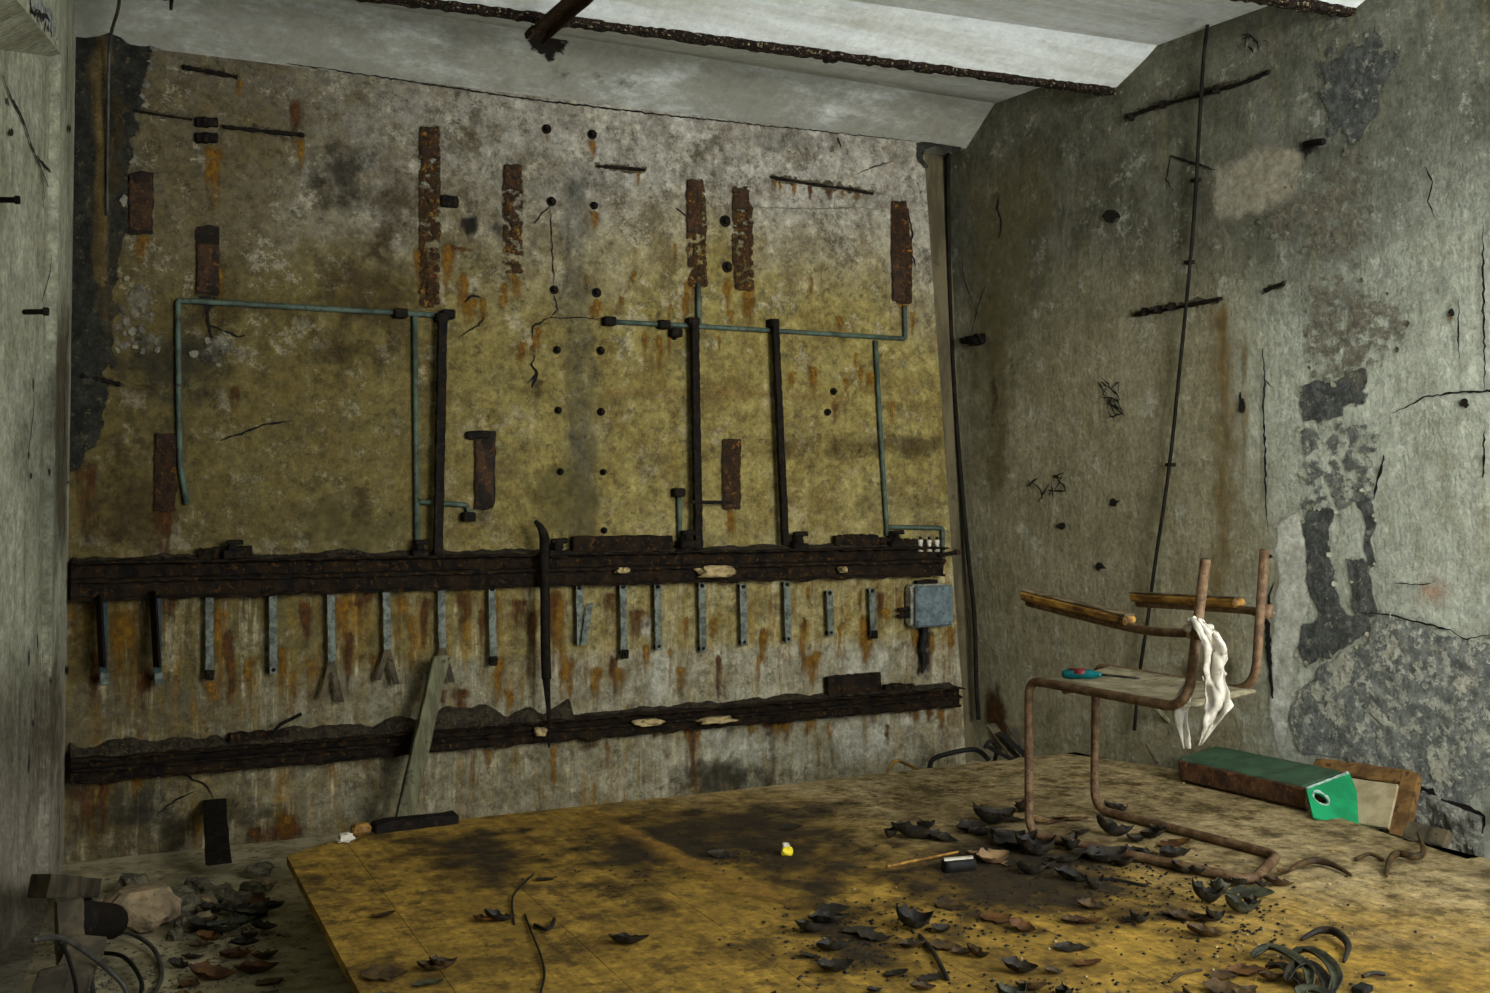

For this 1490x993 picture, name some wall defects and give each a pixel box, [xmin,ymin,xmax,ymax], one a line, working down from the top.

peeling [1310,26,1400,145]
crack [1425,167,1434,217]
spalling [69,33,193,472]
spalling [1262,280,1286,294]
crack [1393,222,1490,413]
peeling [1269,274,1490,804]
corrosion [206,607,256,702]
corrosion [335,593,373,684]
corrosion [458,593,623,696]
corrosion [603,593,649,664]
corrosion [799,618,822,684]
corrosion [859,593,890,659]